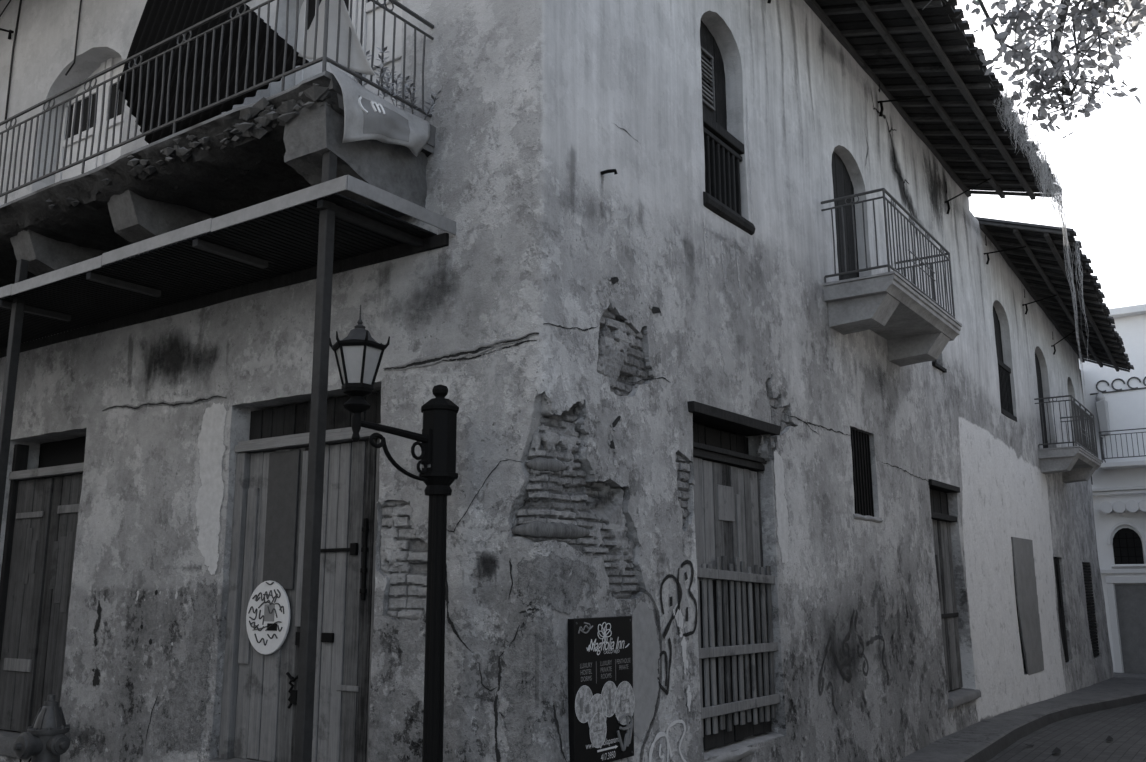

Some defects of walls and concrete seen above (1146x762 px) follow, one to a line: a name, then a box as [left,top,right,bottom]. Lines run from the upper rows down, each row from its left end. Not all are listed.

leakage [891,148,918,220]
leakage [146,336,216,382]
crack [383,323,596,371]
spalling [597,299,656,396]
crack [102,395,226,411]
crack [787,415,851,436]
crack [447,459,520,532]
spalling [676,454,695,529]
spalling [377,500,428,620]
spalling [495,396,639,762]
crack [446,561,536,762]
crack [553,704,567,762]